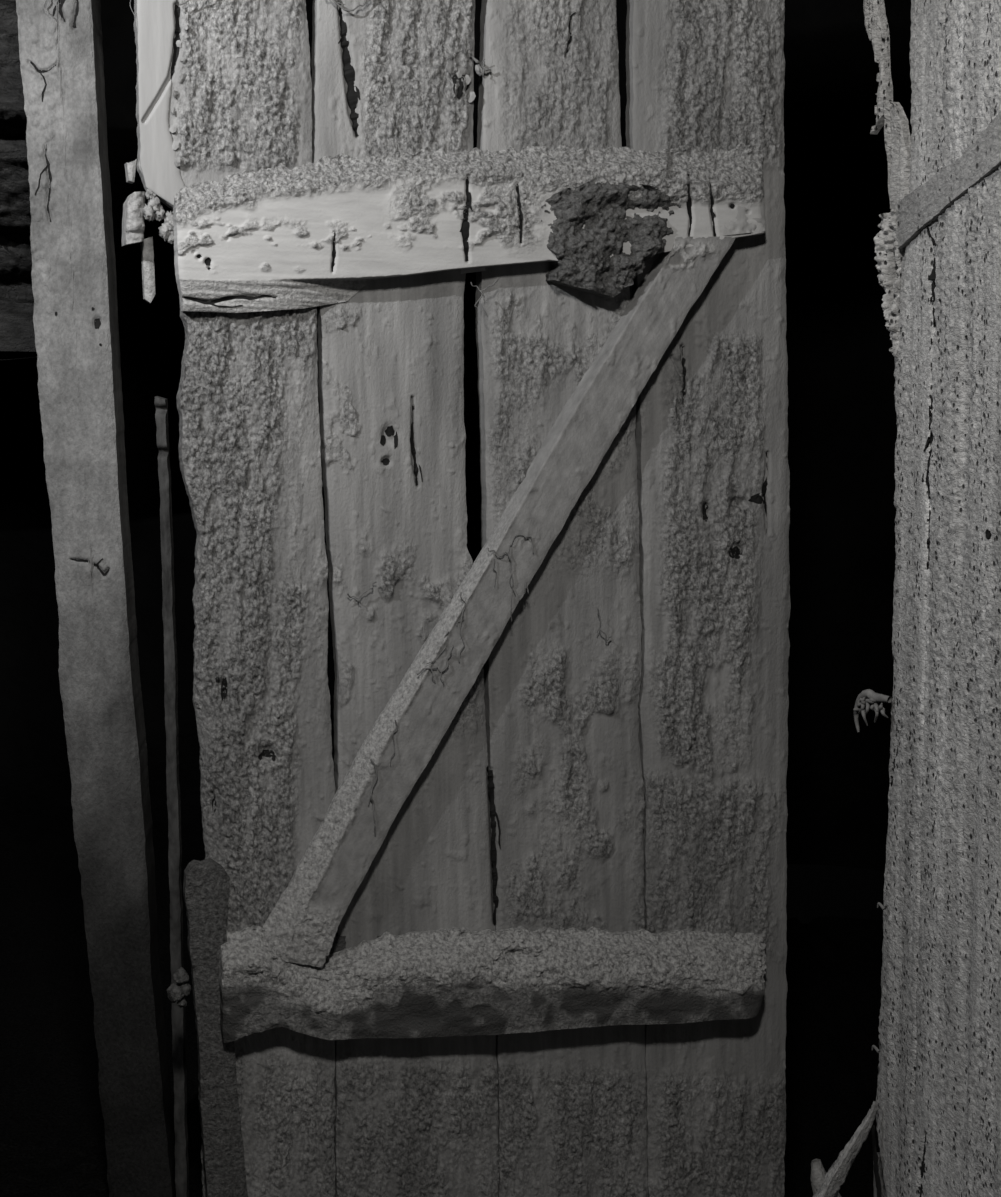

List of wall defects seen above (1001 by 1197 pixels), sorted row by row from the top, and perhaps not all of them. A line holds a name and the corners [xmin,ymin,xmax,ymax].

crack [926,225,936,345]
crack [922,398,933,569]